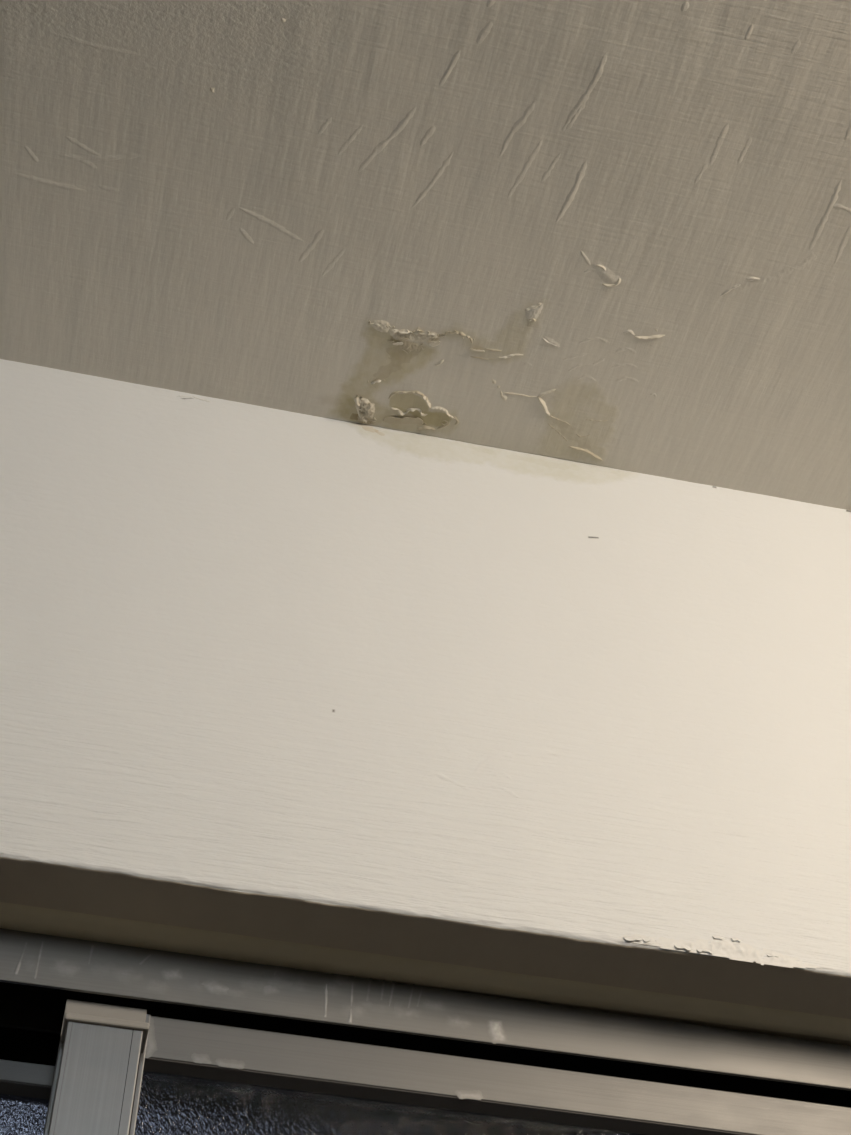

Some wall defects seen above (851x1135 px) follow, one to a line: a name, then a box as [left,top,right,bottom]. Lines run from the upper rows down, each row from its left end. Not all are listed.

peeling [368,320,523,360]
peeling [354,379,459,430]
leakage [316,296,642,487]